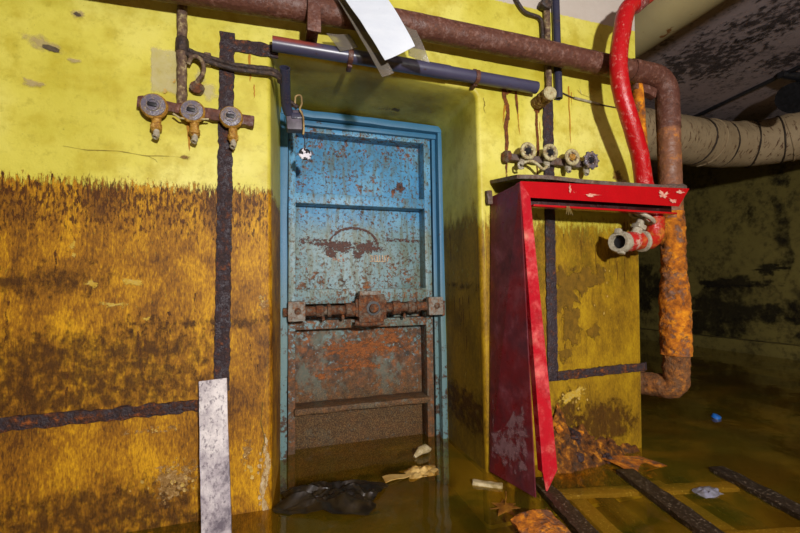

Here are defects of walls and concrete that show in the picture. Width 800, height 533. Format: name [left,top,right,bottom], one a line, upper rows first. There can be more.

spalling [31,37,59,52]
damp [654,0,800,93]
crack [66,146,175,160]
corrosion [499,88,520,151]
damp [0,170,217,418]
damp [228,184,281,533]
peeling [558,386,588,410]
damp [533,214,661,453]
damp [691,198,800,339]
damp [0,410,201,533]